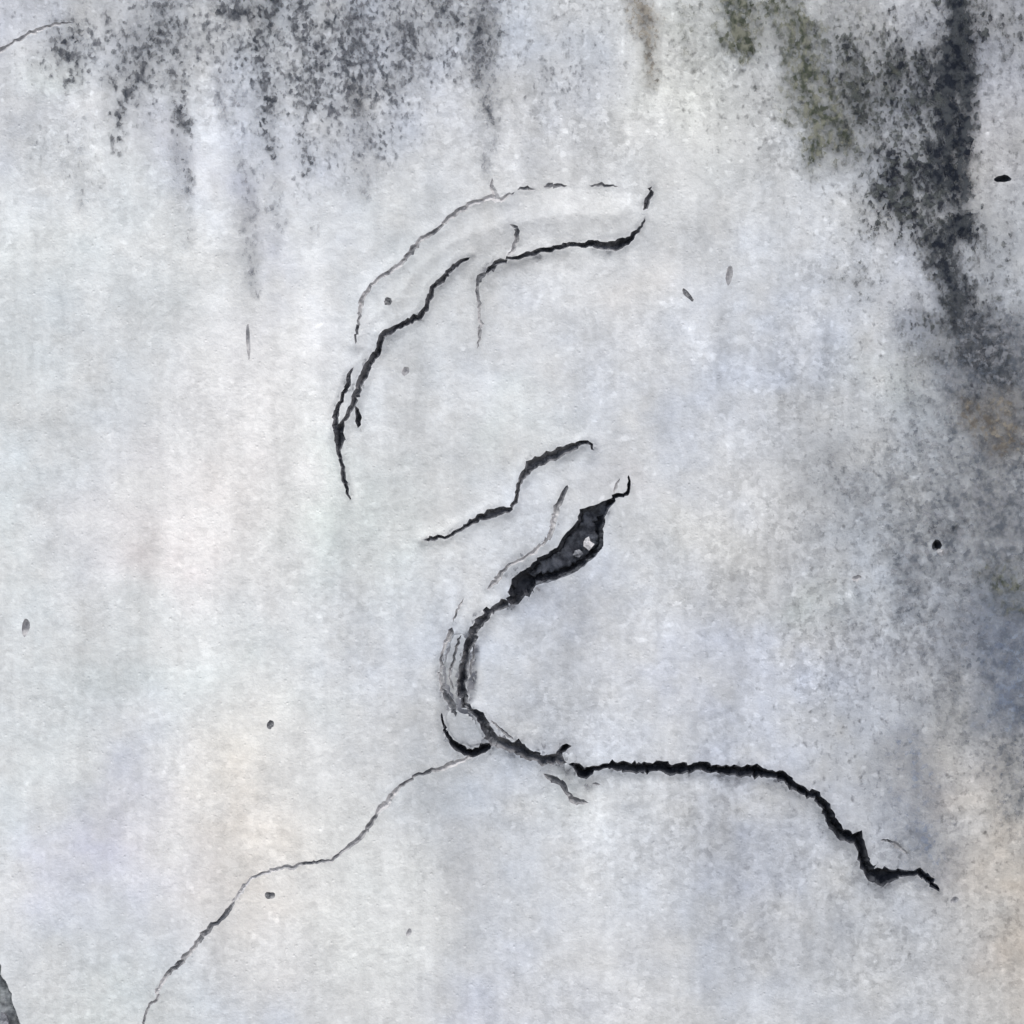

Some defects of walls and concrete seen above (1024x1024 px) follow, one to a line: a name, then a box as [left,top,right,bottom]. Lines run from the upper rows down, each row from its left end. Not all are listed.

water stain [40,0,504,177]
crack [332,179,654,500]
crack [424,440,594,542]
water stain [773,0,1024,819]
crack [142,485,940,1024]